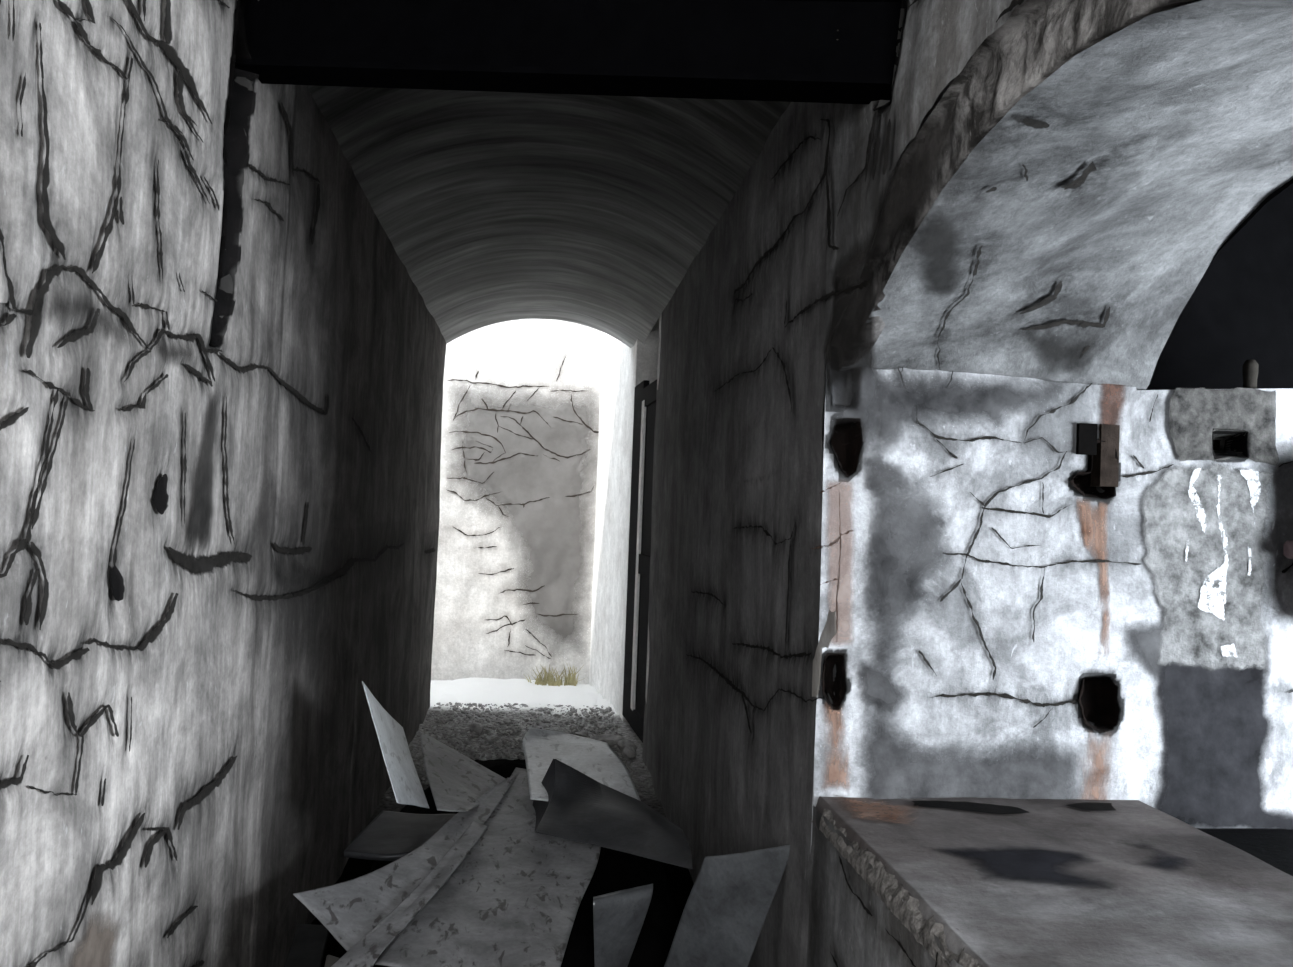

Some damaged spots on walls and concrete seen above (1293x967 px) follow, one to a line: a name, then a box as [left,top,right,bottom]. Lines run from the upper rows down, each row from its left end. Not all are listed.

crack [0,0,599,806]
corrosion [1101,384,1125,425]
crack [686,483,853,733]
leakage [861,663,904,709]
crack [916,281,1141,728]
corrosion [1080,504,1109,637]
leakage [1129,625,1170,677]
peeling [1188,468,1229,621]
peeling [1240,469,1261,526]
crack [29,756,237,967]
spalling [819,809,982,967]
leakage [943,848,1107,887]